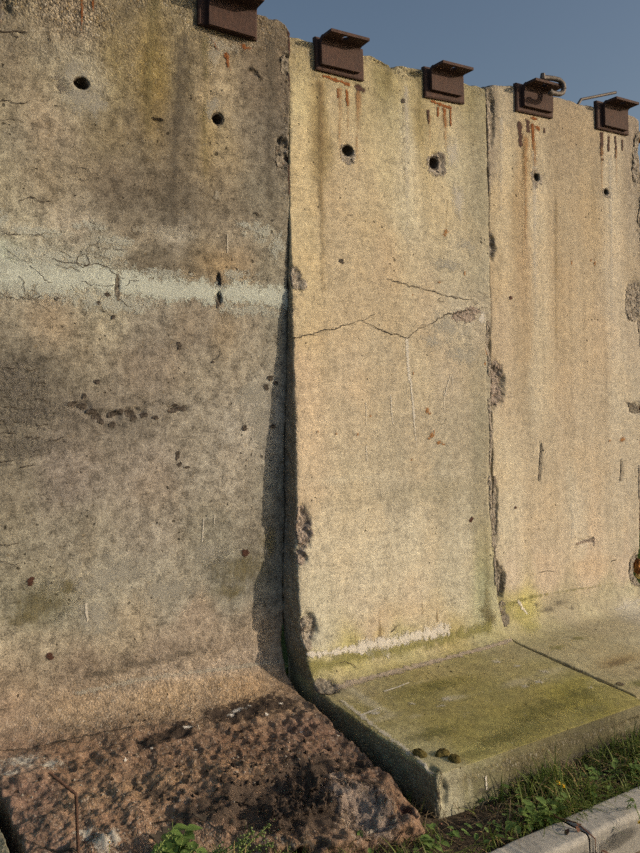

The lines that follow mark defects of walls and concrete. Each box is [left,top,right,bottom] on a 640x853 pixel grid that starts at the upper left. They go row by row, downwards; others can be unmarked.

corrosion [323,75,365,115]
corrosion [427,100,452,138]
corrosion [517,116,546,182]
corrosion [600,132,623,161]
crack [0,230,138,316]
crack [293,279,487,339]
spalling [625,281,640,347]
spalling [485,320,510,627]
spalling [294,505,314,566]
crack [0,726,138,751]
water stain [341,700,434,775]
spalling [323,771,400,848]